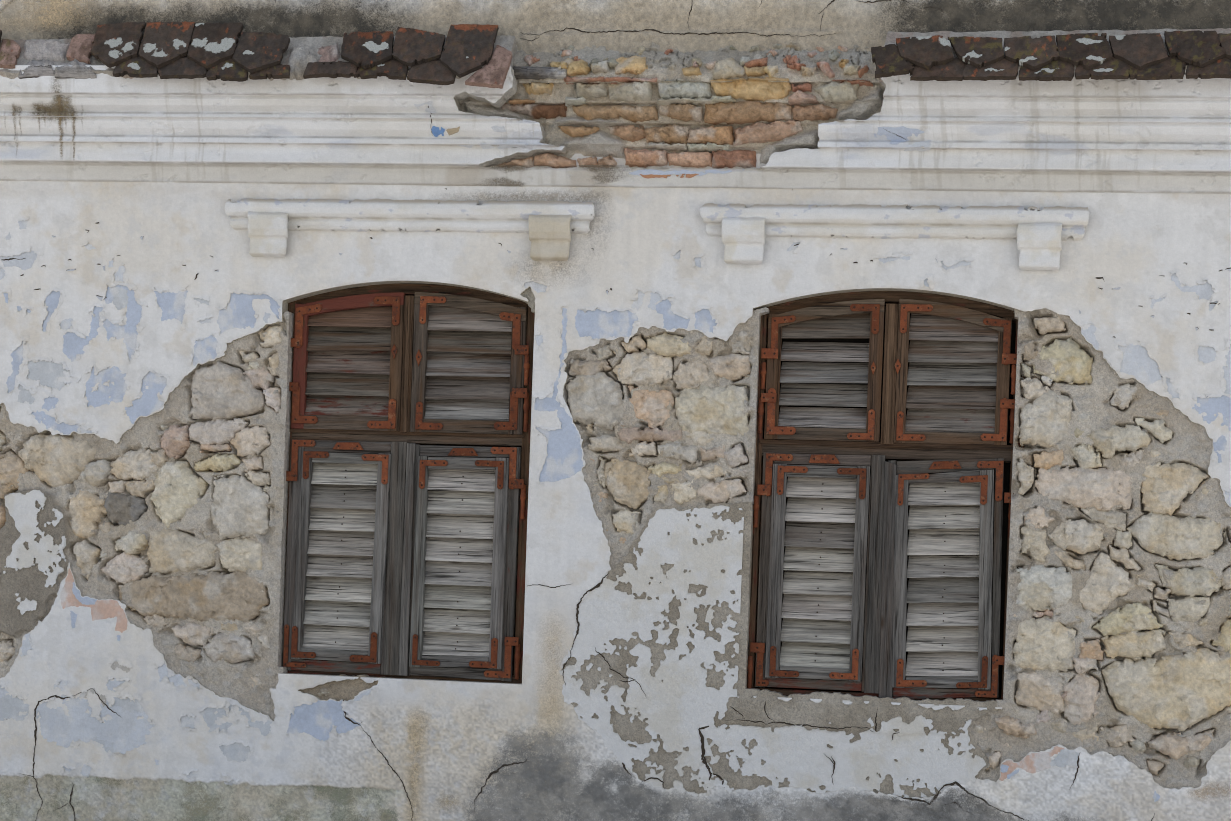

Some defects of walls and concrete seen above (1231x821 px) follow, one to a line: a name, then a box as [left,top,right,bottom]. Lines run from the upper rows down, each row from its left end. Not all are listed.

crack [520,0,943,41]
leakage [882,0,1231,33]
leakage [13,78,78,156]
spalling [414,42,932,178]
peeling [520,278,550,314]
peeling [919,254,975,290]
spalling [0,216,385,789]
spalling [532,263,1231,806]
crack [528,573,646,696]
crack [23,688,119,821]
crack [343,700,413,820]
leakage [442,732,1022,821]